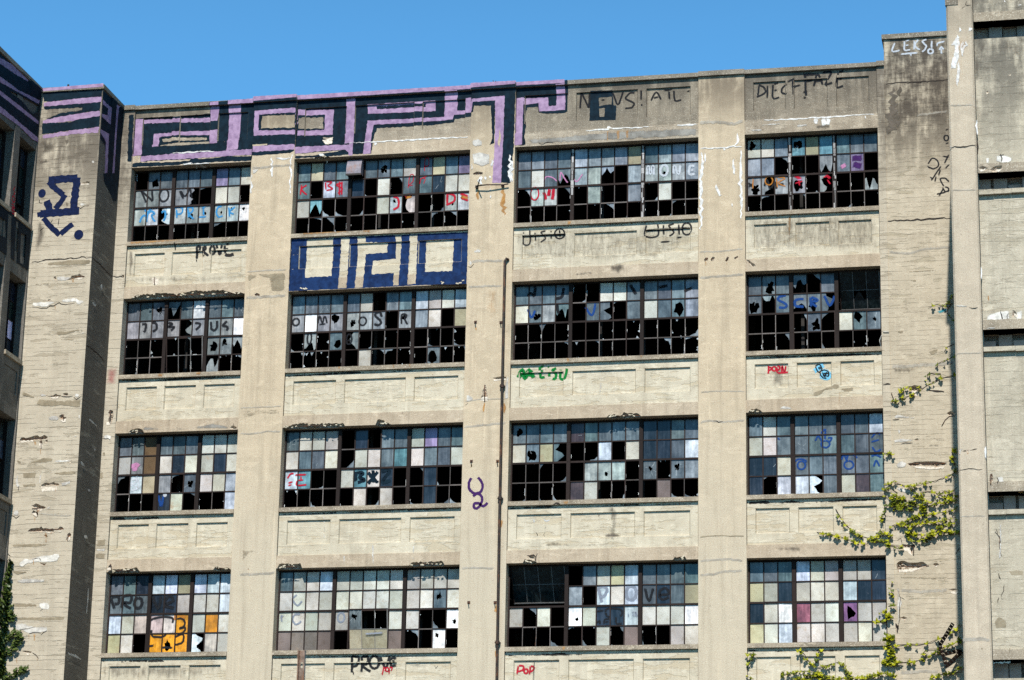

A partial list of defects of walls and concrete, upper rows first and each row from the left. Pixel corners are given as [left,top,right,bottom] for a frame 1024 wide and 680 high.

spalling [979,156,1011,173]
crack [890,215,950,223]
peeling [23,392,80,422]
peeling [17,435,84,492]
spalling [907,461,947,469]
spalling [13,504,71,547]
spalling [897,538,939,583]
peeling [13,603,64,620]